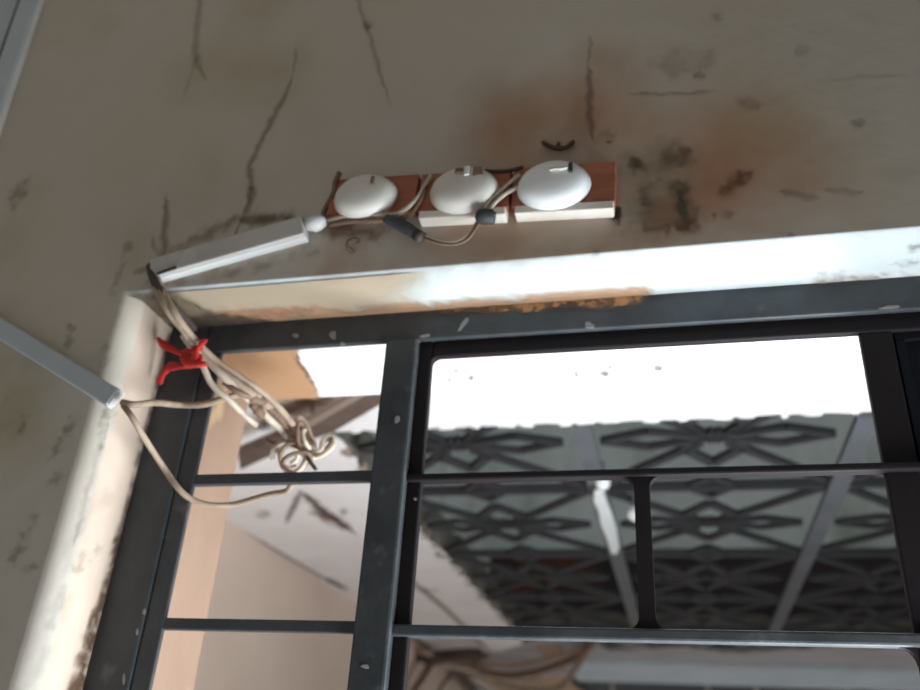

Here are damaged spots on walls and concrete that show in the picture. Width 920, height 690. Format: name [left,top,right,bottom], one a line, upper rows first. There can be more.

flaking render [211,288,650,331]
peeling [222,350,320,401]
spalling [68,483,134,690]